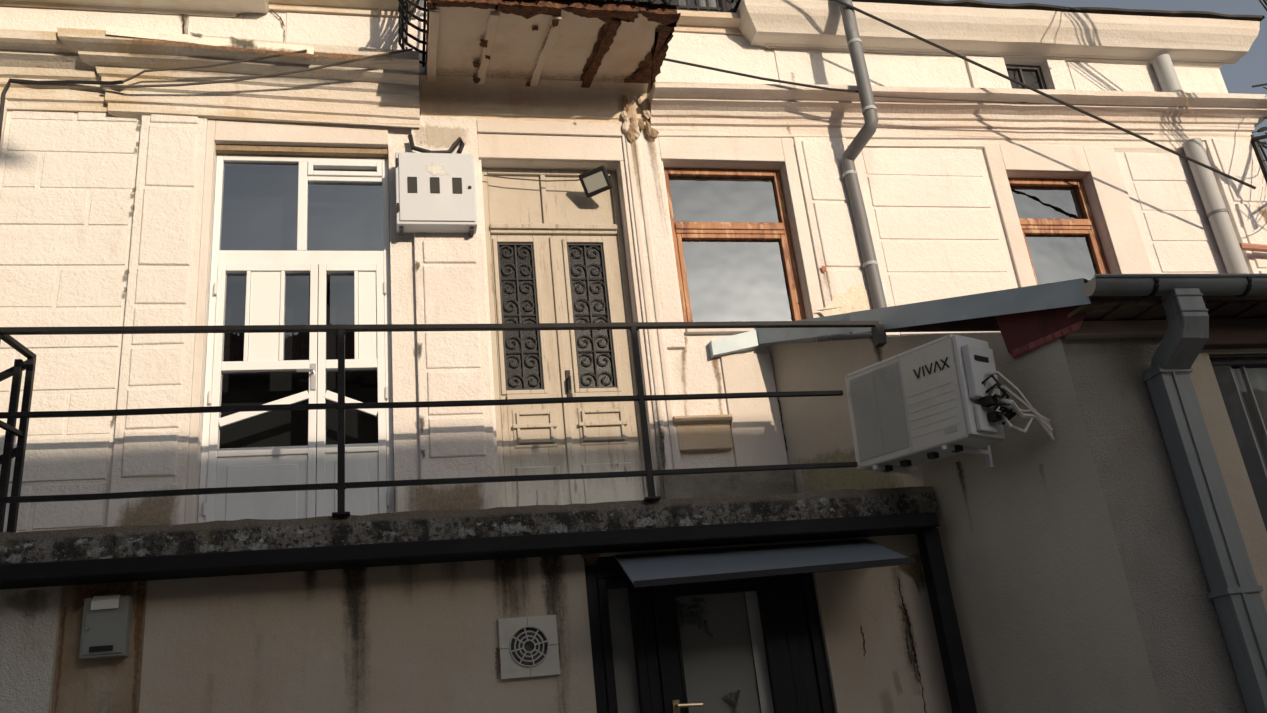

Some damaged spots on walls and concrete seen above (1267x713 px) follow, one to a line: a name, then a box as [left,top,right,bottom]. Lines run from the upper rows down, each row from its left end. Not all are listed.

spalling [425,0,681,173]
water stain [344,567,366,659]
water stain [541,555,563,660]
crack [897,576,927,713]